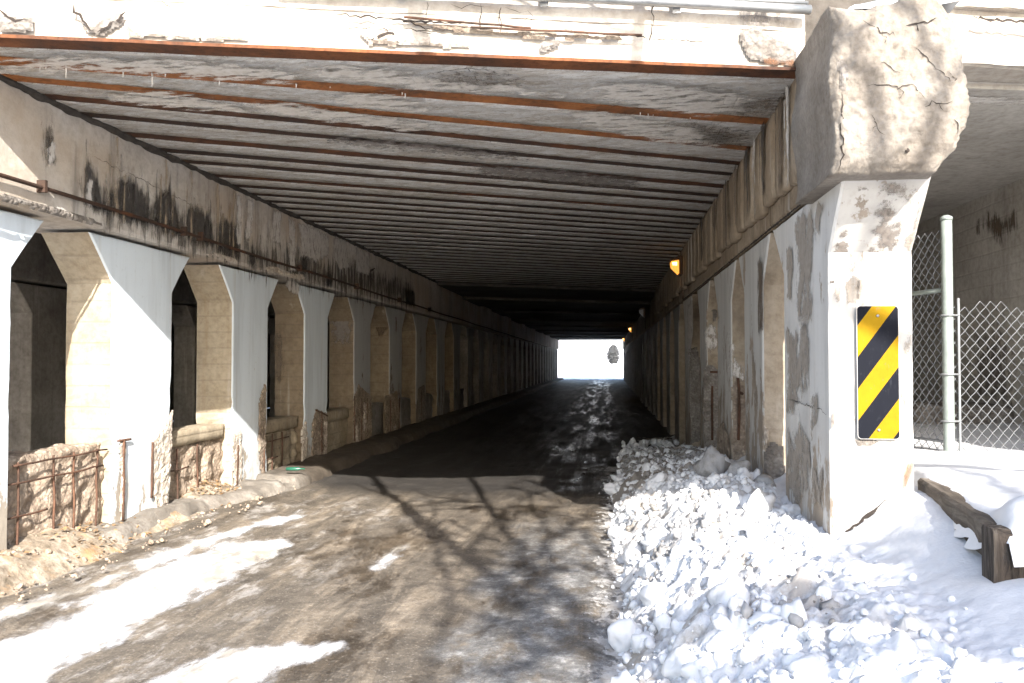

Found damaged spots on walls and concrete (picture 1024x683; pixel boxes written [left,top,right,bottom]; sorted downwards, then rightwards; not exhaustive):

spalling [72,4,248,42]
spalling [360,16,642,52]
spalling [740,26,796,66]
crack [863,18,959,138]
water stain [0,55,641,189]
crack [838,96,846,168]
water stain [79,160,415,310]
peeling [833,229,849,253]
peeling [869,182,924,253]
peeling [830,276,891,306]
peeling [764,202,823,506]
peeling [901,336,912,411]